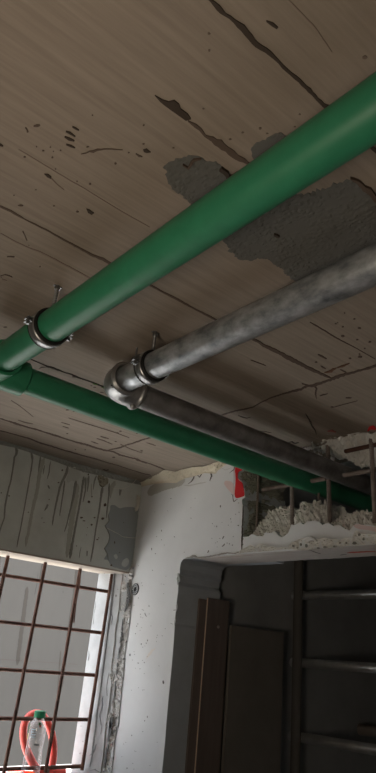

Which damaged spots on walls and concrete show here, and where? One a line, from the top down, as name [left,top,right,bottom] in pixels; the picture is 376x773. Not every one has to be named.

crack [209,0,329,108]
crack [82,147,123,155]
spalling [163,147,237,205]
crack [188,120,250,164]
crack [0,205,111,264]
spalling [223,179,376,282]
crack [149,285,217,321]
crack [222,322,376,435]
spalling [303,432,376,469]
water stain [52,466,139,570]
spalling [185,470,376,559]
flaking render [0,541,145,773]